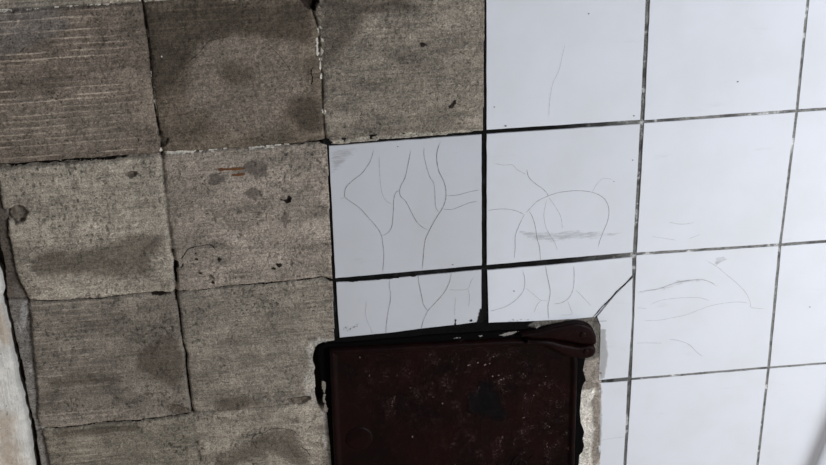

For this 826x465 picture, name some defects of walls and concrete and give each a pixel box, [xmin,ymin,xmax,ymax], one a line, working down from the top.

crack [344,144,478,328]
crack [493,172,609,318]
crack [593,275,633,317]